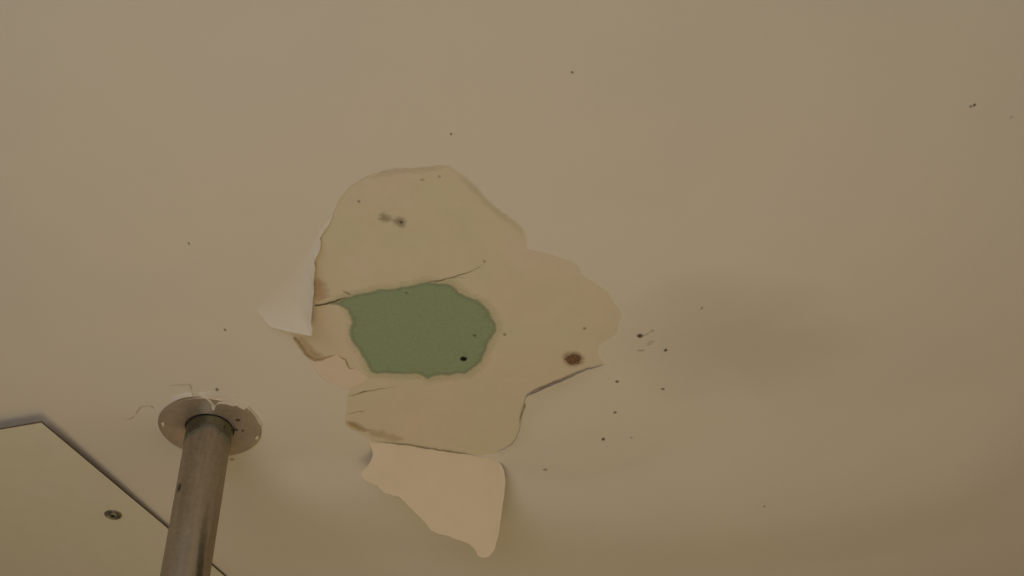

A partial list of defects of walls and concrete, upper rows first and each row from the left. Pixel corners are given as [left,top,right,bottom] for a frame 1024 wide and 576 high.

peeling [256,165,622,558]